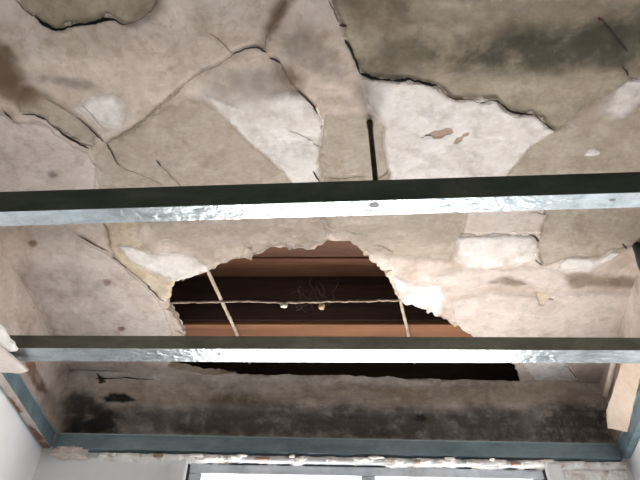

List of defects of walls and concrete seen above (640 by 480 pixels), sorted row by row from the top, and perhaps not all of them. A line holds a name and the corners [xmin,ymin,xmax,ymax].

crack [4,0,322,186]
spalling [0,0,640,192]
crack [328,0,553,130]
water stain [462,23,640,70]
crack [598,17,640,80]
crack [313,171,388,182]
peeling [25,233,183,336]
crack [77,235,163,301]
peeling [120,246,207,281]
peeling [148,207,640,338]
water stain [63,393,448,439]
water stain [449,406,610,442]